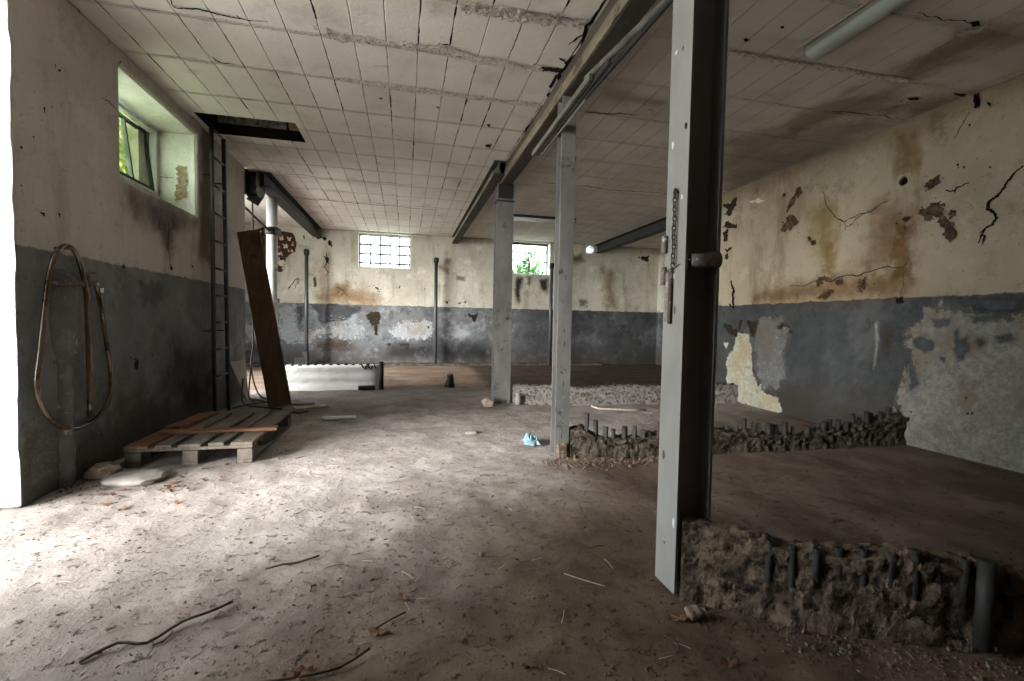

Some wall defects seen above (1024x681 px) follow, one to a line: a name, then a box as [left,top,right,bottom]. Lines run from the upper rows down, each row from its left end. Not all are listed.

crack [525,0,606,132]
spalling [174,165,188,201]
flaking render [259,227,332,272]
spalling [723,197,764,259]
flaking render [781,187,816,245]
crack [795,261,907,295]
crack [822,187,888,230]
flaking render [895,163,969,243]
crack [978,165,1023,244]
peeling [278,302,434,350]
peeling [723,315,793,413]
peeling [893,300,1024,474]